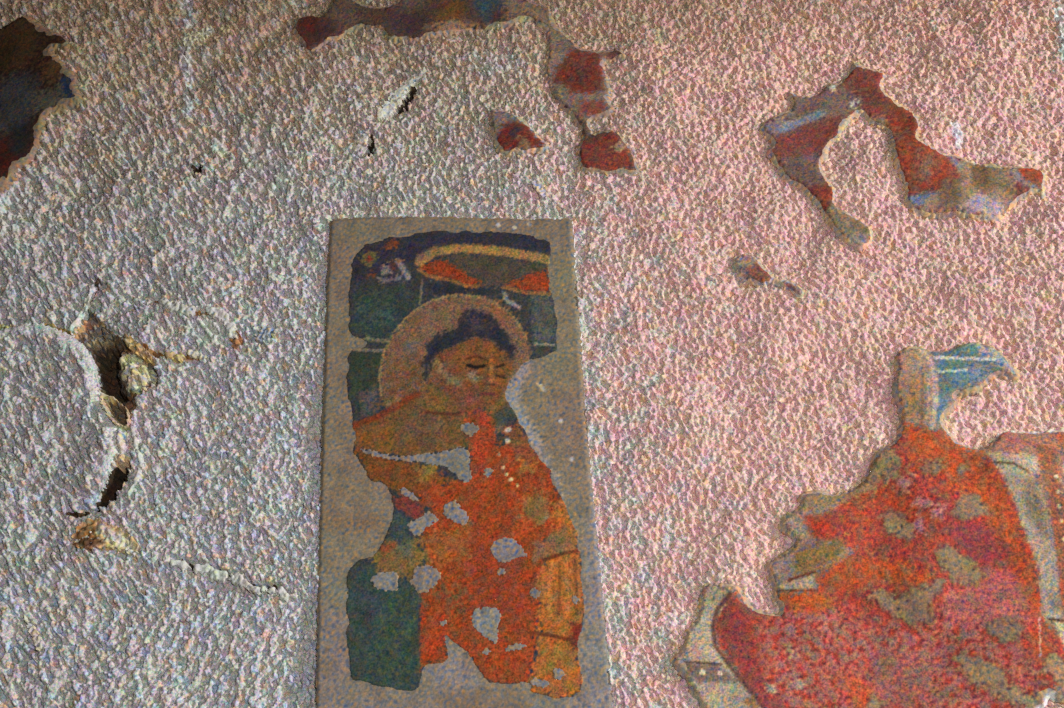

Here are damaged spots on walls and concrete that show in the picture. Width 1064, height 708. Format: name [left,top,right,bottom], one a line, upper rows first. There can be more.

peeling [360,422,494,483]
peeling [400,487,419,501]
peeling [407,499,469,536]
peeling [490,537,527,576]
peeling [370,564,441,593]
peeling [24,615,44,652]
peeling [470,607,526,655]
peeling [530,668,565,688]